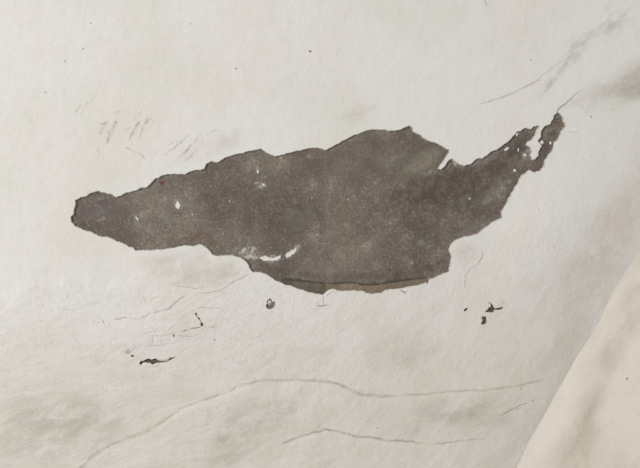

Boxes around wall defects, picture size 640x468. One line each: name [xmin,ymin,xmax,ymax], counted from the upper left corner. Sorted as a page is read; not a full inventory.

flaking render [71,112,566,296]
peeling [480,298,504,325]
peeling [125,346,175,367]